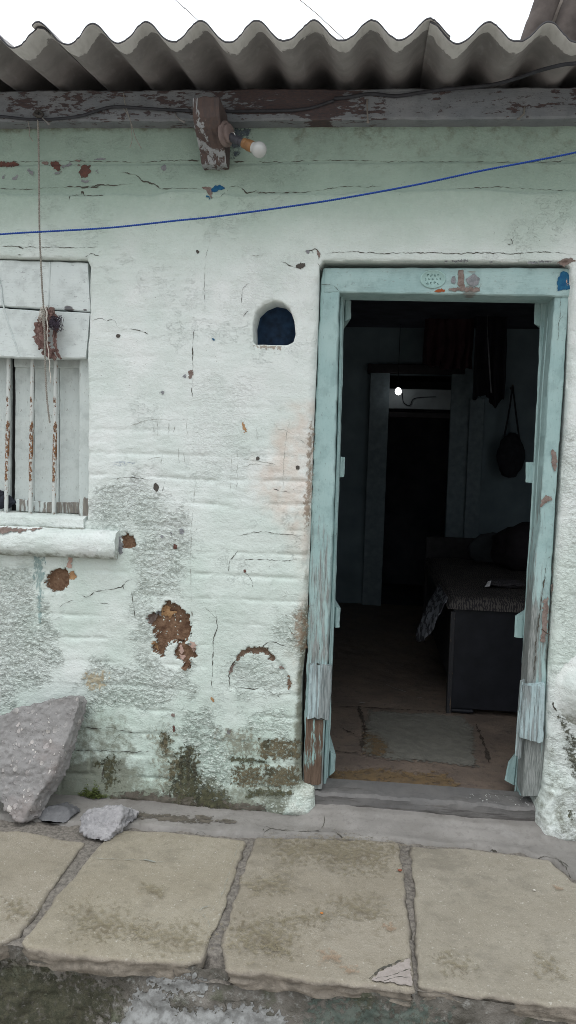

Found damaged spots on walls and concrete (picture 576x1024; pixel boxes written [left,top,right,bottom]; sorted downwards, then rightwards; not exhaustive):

peeling [0,158,106,183]
crack [0,159,452,198]
flaking render [44,557,77,592]
flaking render [118,532,136,555]
crack [228,531,300,586]
flaking render [146,600,198,671]
flaking render [229,646,292,690]
water stain [110,748,266,824]